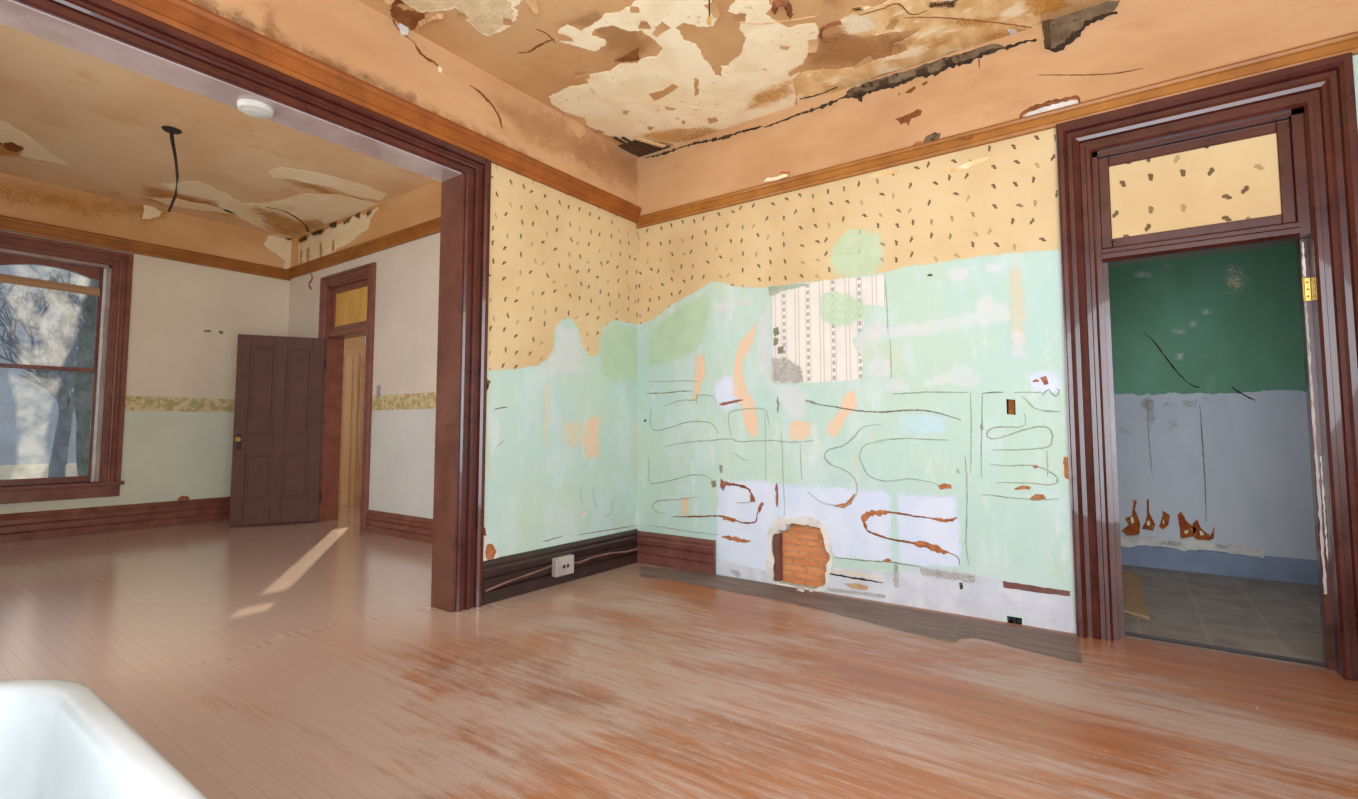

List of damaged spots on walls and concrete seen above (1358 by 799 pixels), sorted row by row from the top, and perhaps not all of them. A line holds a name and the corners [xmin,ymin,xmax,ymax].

peeling [384,0,540,36]
peeling [549,0,1120,145]
crack [1054,68,1143,76]
peeling [0,120,69,166]
peeling [123,167,388,269]
peeling [818,225,887,327]
spalling [483,377,499,561]
peeling [712,253,1077,634]